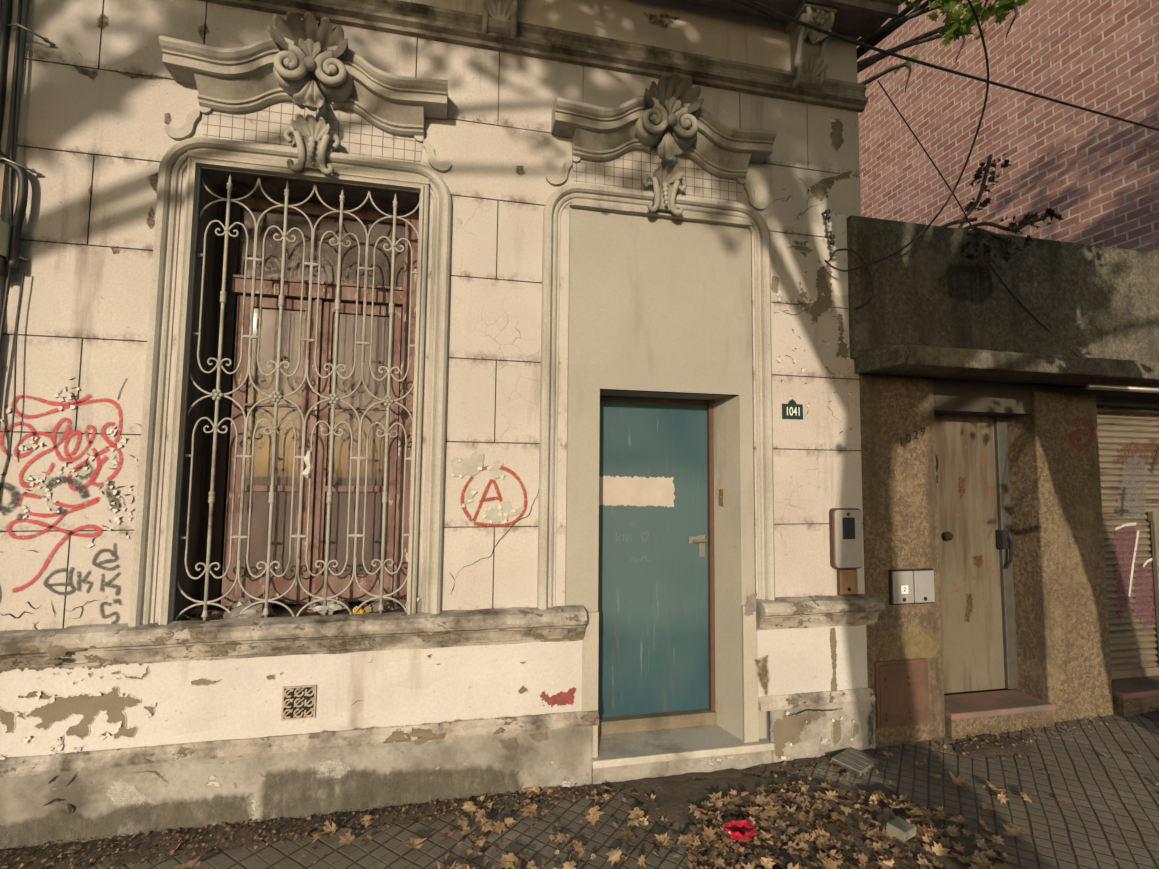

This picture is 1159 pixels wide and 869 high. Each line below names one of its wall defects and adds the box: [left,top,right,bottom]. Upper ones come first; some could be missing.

peeling [807,170,853,216]
peeling [771,230,850,377]
peeling [53,376,79,410]
peeling [17,437,46,451]
peeling [18,453,95,519]
peeling [87,426,138,548]
peeling [0,641,156,755]
peeling [190,677,222,687]
peeling [517,684,577,710]
spalling [770,708,860,760]
damp [0,760,520,850]